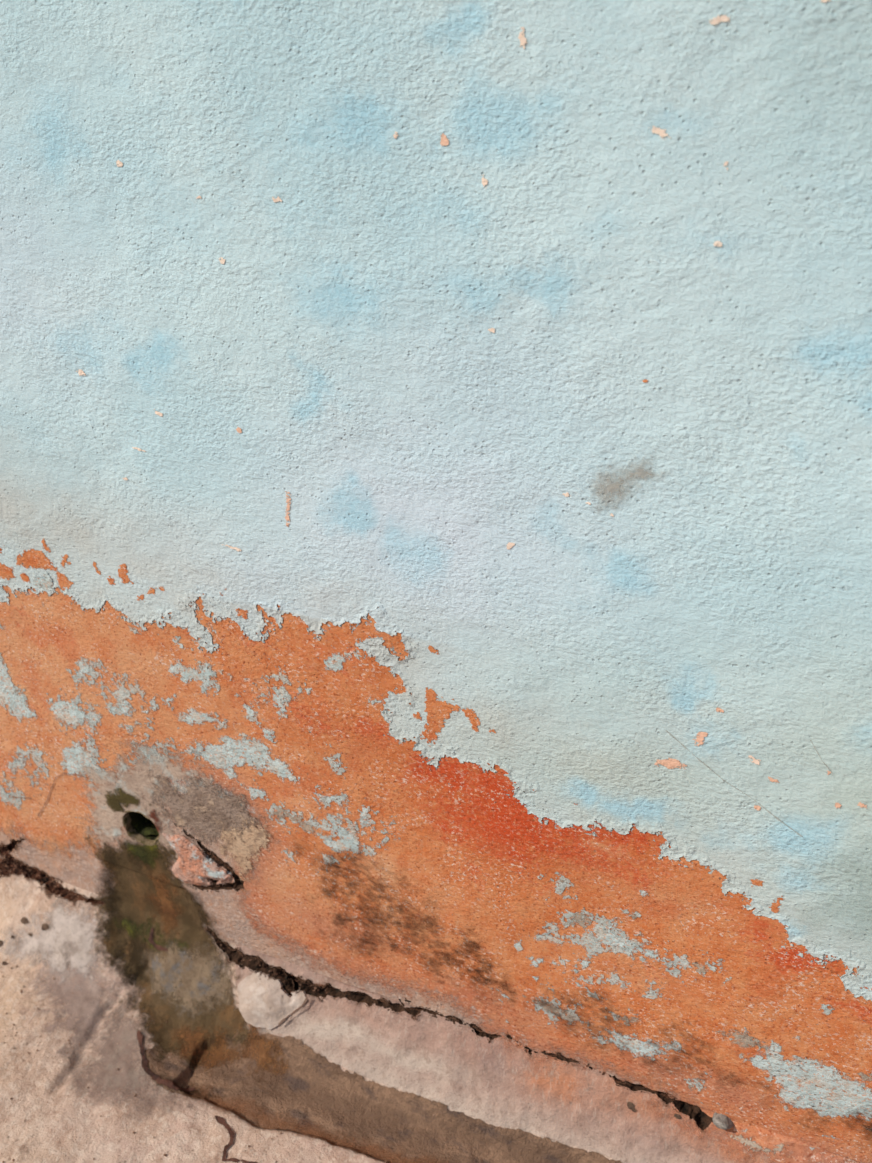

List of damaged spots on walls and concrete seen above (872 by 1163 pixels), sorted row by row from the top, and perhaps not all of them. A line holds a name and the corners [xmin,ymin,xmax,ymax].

crack [0,773,105,906]
crack [174,824,244,892]
water stain [321,853,491,984]
peeling [0,539,872,1163]
crack [137,1030,195,1092]
water stain [1,899,621,1163]
crack [205,927,713,1132]
crack [215,1115,277,1163]